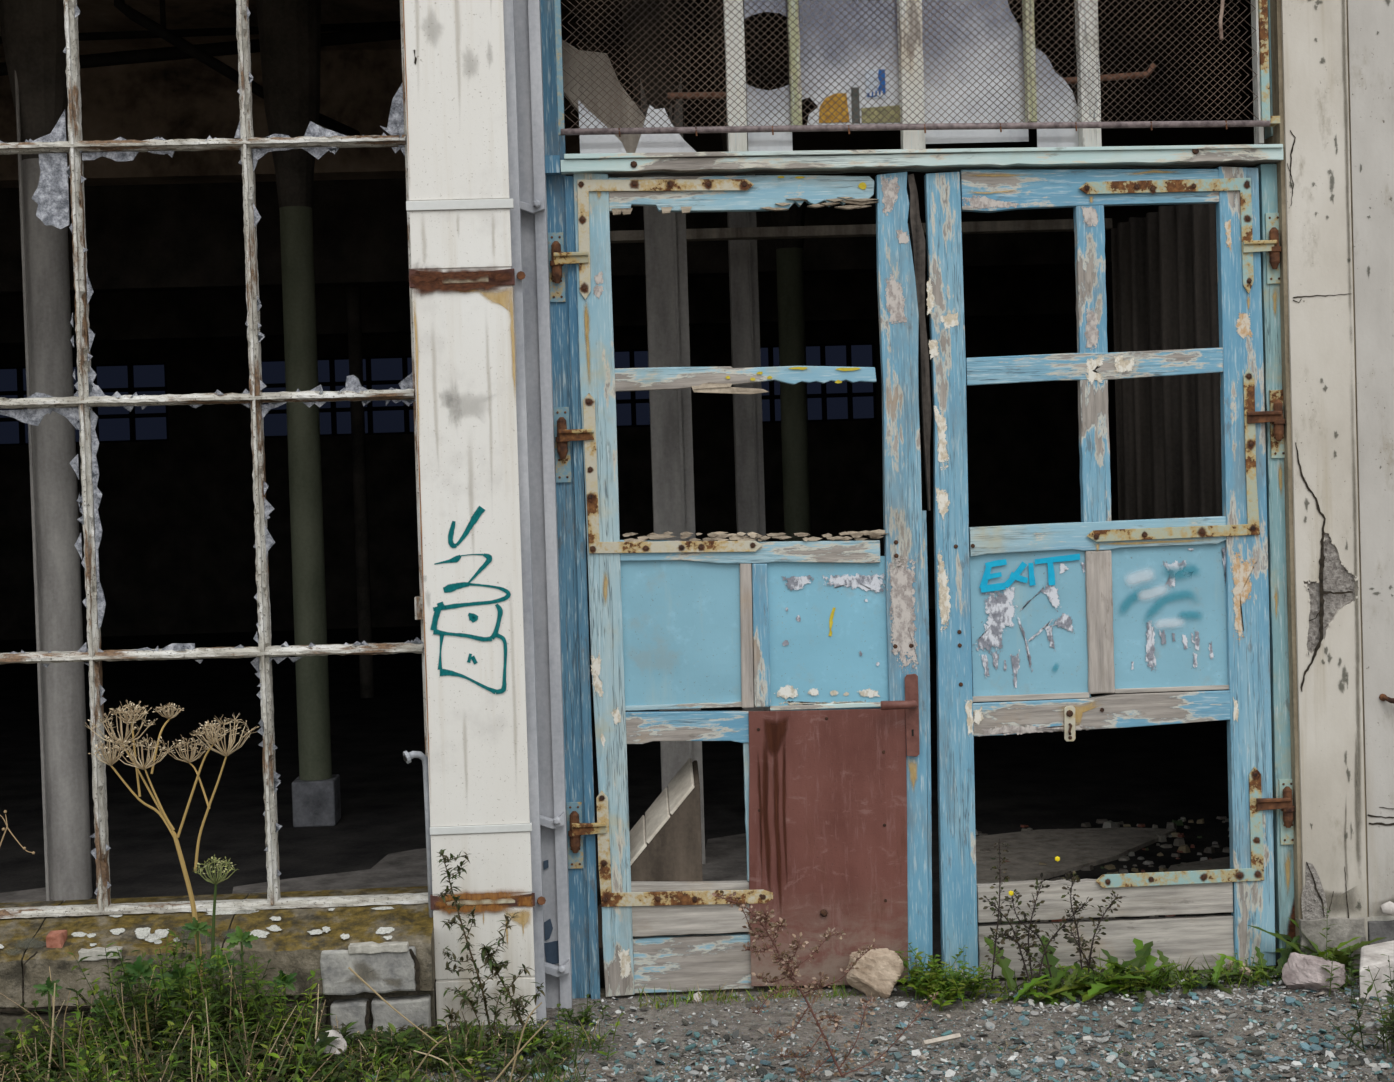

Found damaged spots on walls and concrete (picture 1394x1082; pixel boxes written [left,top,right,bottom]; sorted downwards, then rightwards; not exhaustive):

peeling [858,175,909,244]
corrosion [410,268,515,387]
peeling [884,273,908,327]
peeling [781,557,918,674]
peeling [972,562,1085,688]
peeling [1131,616,1214,671]
peeling [1222,547,1257,645]
crack [1295,442,1353,692]
spalling [1303,533,1379,656]
corrosion [758,720,787,903]
corrosion [909,763,917,787]
corrosion [436,891,532,943]